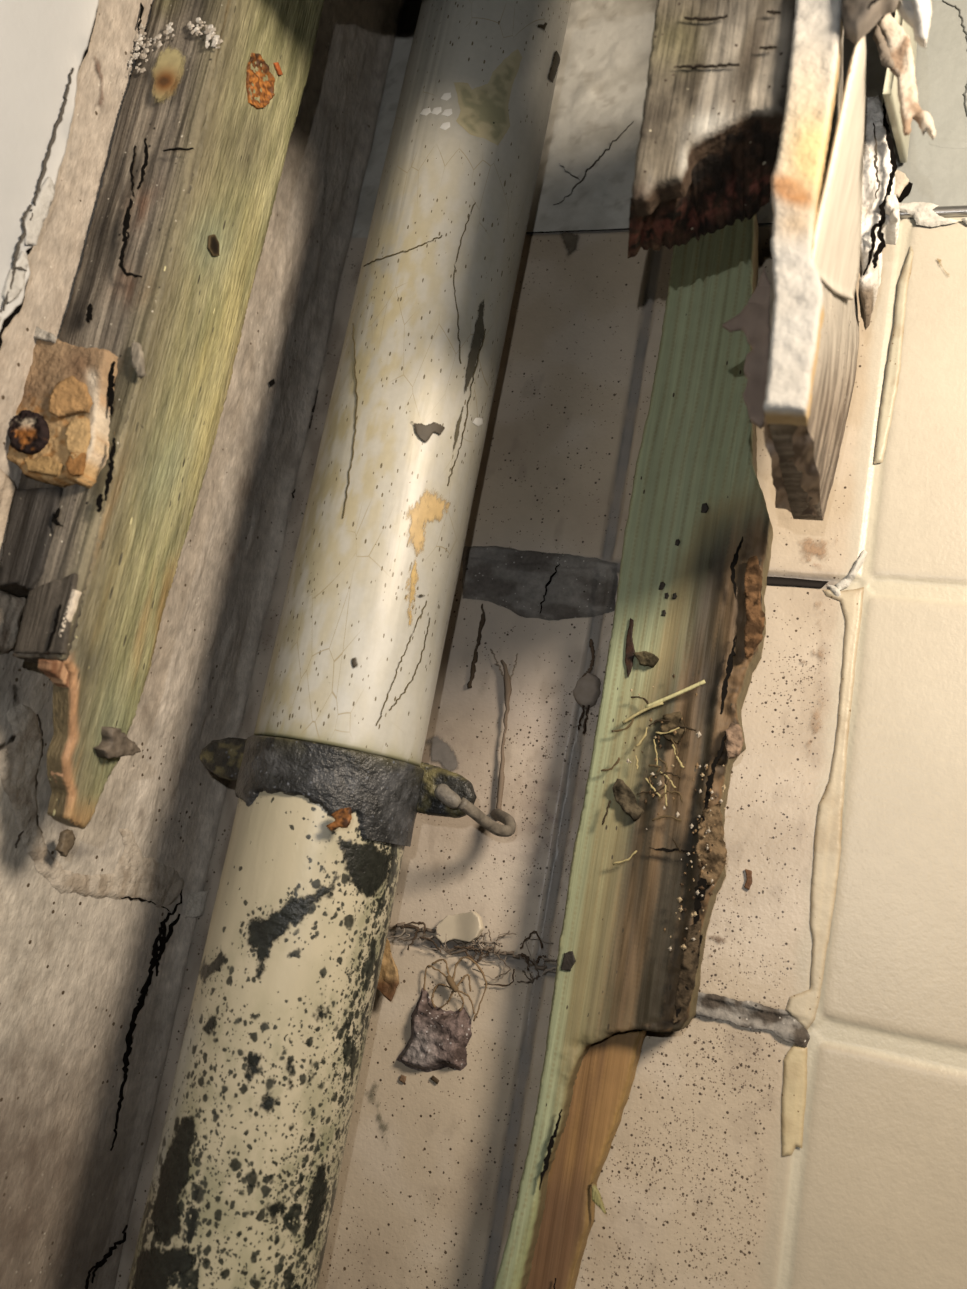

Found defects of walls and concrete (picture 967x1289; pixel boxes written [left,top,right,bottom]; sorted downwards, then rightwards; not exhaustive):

crack [0,8,98,349]
peeling [420,49,522,146]
peeling [858,0,936,330]
peeling [131,342,146,379]
peeling [0,469,82,655]
crack [15,714,46,848]
spalling [0,704,184,909]
crack [110,889,183,1151]
peeling [435,911,484,943]
crack [85,1225,128,1289]